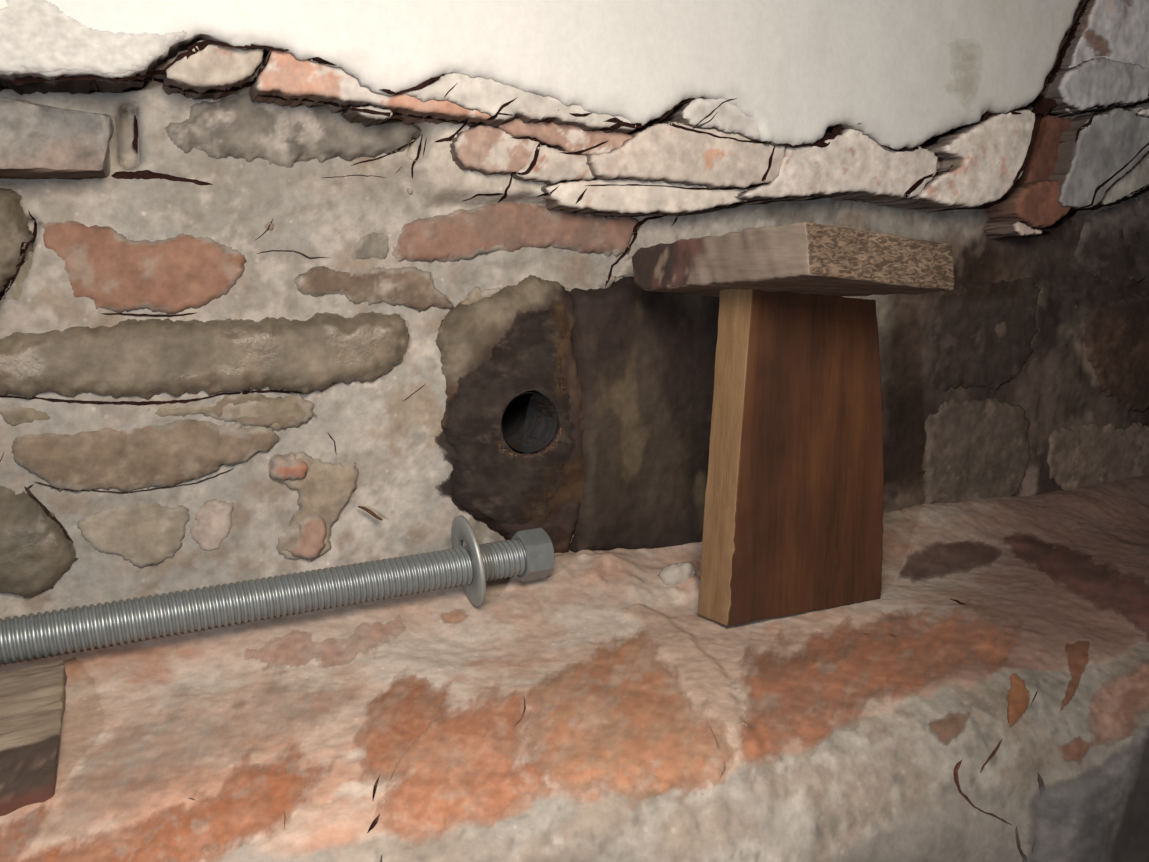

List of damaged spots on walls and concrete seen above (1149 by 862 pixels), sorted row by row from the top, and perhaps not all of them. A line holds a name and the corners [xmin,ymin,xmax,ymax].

peeling [341,106,393,127]
crack [7,40,862,287]
crack [882,0,1090,199]
peeling [1040,0,1149,209]
crack [1075,94,1149,144]
crack [1078,143,1149,209]
peeling [981,220,1043,239]
spalling [900,535,1149,635]
spalling [356,613,1017,835]
spalling [1061,641,1089,710]
crack [953,691,1038,862]
crack [1037,773,1045,792]